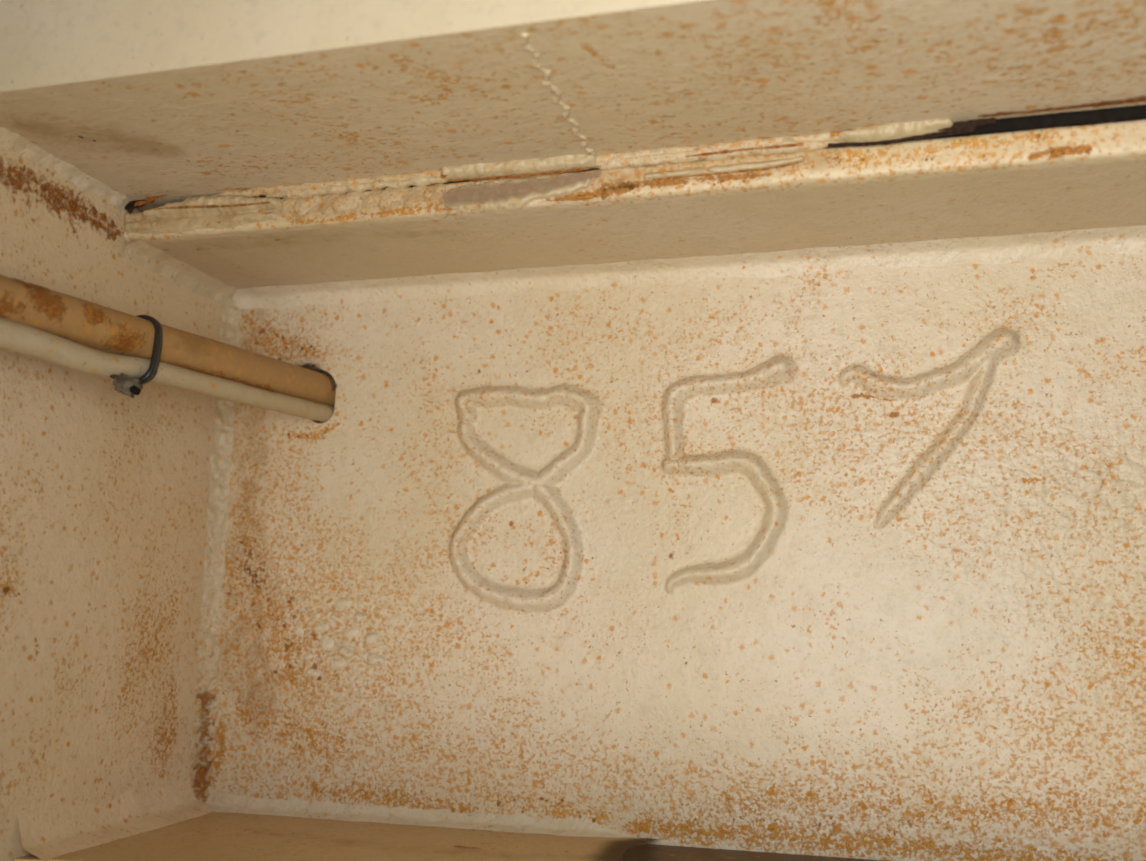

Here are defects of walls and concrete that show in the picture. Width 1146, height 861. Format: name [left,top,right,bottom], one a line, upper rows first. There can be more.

crack [935,96,1146,139]
rust [819,130,1092,171]
rust [0,158,122,241]
peeling [124,188,283,235]
peeling [439,154,602,214]
rust [191,463,348,802]
rust [310,780,476,814]
rust [486,787,611,828]
rust [624,774,1146,861]